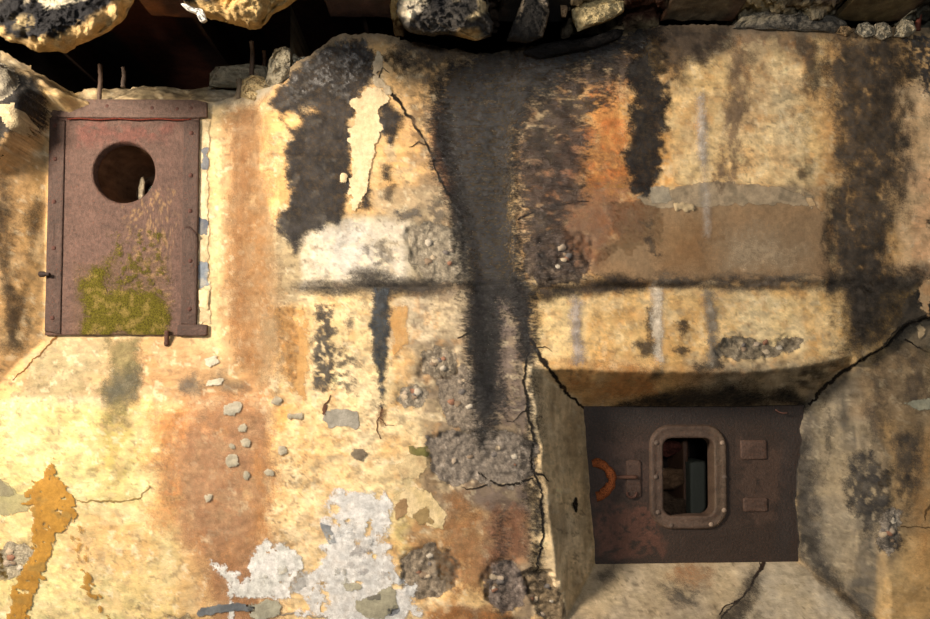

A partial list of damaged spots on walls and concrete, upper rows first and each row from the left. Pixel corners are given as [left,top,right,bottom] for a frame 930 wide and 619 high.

damp [0,116,12,144]
damp [0,66,52,136]
crack [378,67,462,225]
crack [517,201,589,220]
damp [269,24,930,619]
crack [808,314,929,406]
crack [463,335,584,572]
peeling [248,599,281,619]
crack [719,562,765,615]